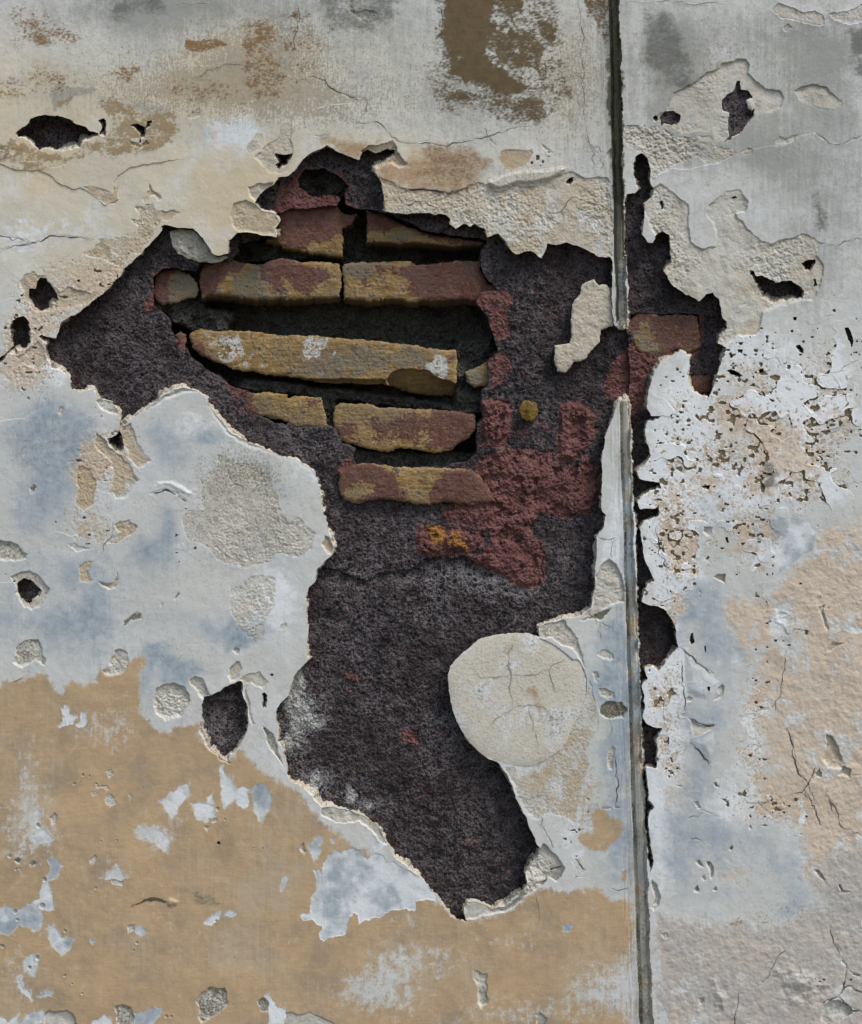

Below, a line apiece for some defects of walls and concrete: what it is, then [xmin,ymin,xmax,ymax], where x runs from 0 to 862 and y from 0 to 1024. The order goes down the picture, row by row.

flaking render [245,122,294,175]
flaking render [622,59,862,515]
flaking render [13,141,630,942]
peeling [766,517,816,576]
crack [473,644,562,744]
flaking render [633,503,714,828]
peeling [748,602,796,654]
crack [775,653,861,835]
flaking render [819,605,862,653]
crack [824,930,862,1012]